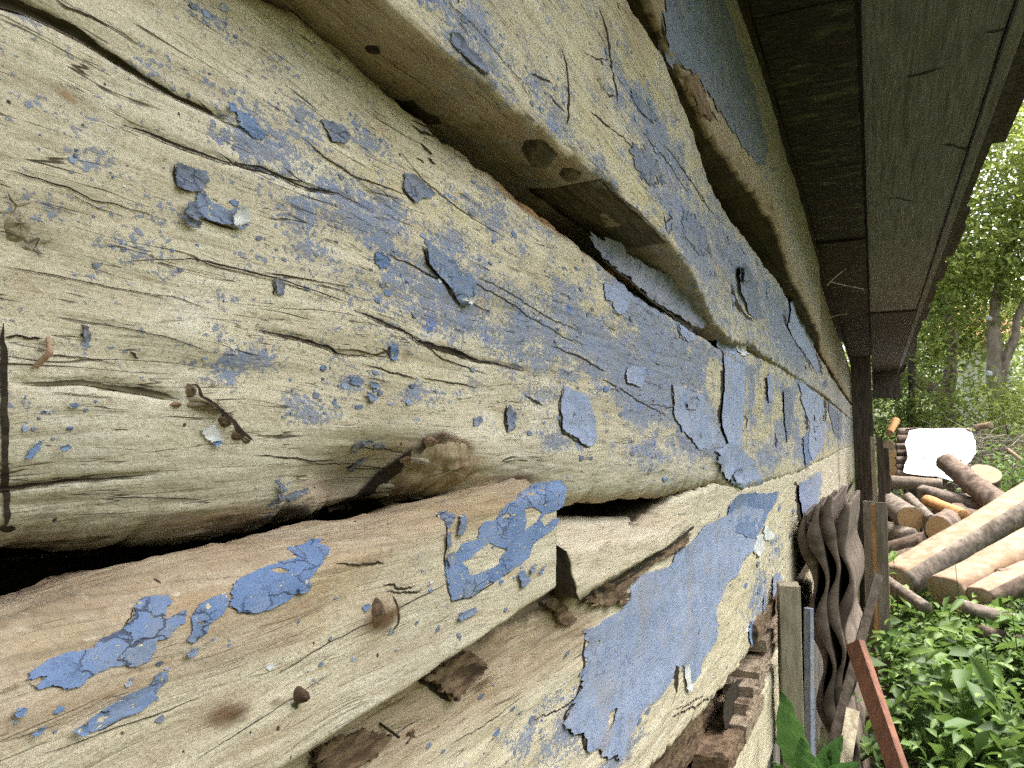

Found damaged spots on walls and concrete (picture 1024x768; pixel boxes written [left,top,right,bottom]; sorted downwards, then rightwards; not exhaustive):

crack [0,0,244,129]
peeling [188,2,238,38]
peeling [657,0,769,165]
peeling [173,162,251,230]
peeling [419,233,482,316]
peeling [542,187,843,768]
peeling [421,476,569,640]
peeling [27,538,330,737]
peeling [14,707,28,724]